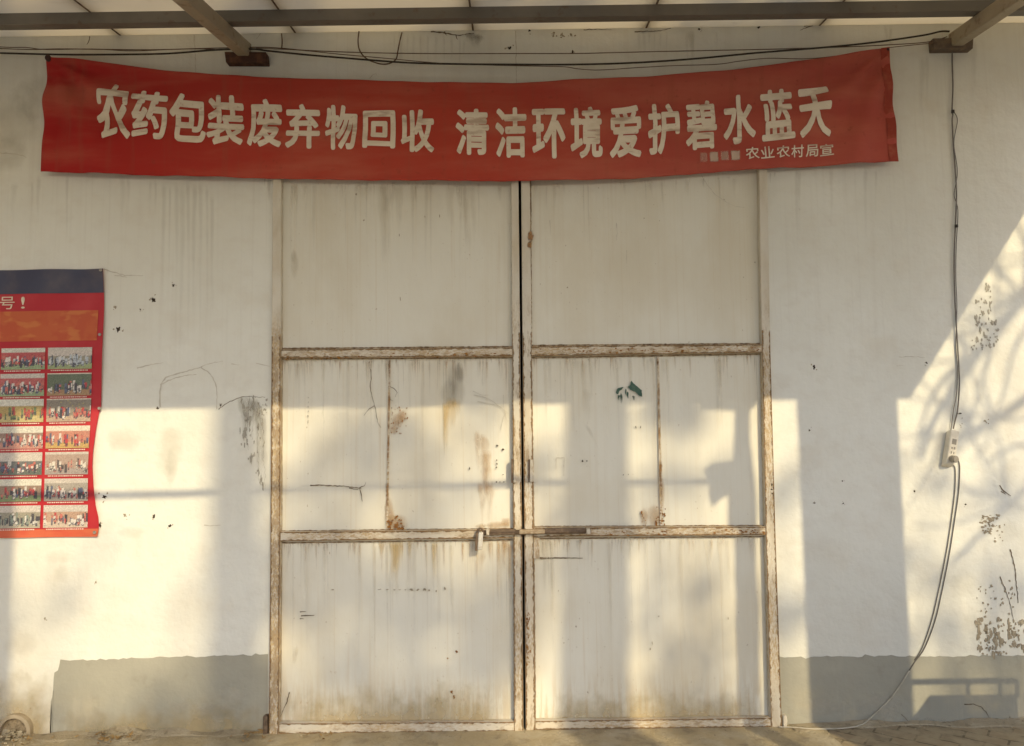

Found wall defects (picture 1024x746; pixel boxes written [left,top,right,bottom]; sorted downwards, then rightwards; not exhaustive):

peeling [971,283,999,350]
corrosion [269,181,782,734]
peeling [979,514,1005,542]
peeling [974,580,1024,659]